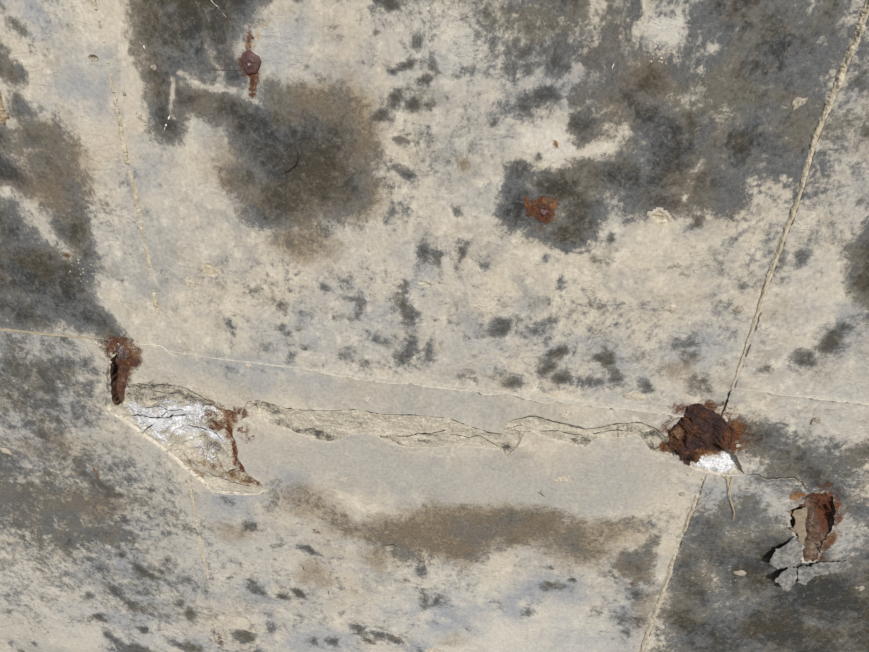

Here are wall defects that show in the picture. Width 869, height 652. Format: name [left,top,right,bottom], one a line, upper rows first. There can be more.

damp [0,44,127,344]
corrosion [238,31,260,98]
damp [126,0,395,253]
corrosion [523,196,560,231]
damp [494,0,869,254]
damp [842,217,869,320]
spalling [92,334,677,496]
corrosion [658,400,762,466]
damp [293,495,661,585]
damp [651,415,869,652]
spalling [690,449,853,592]